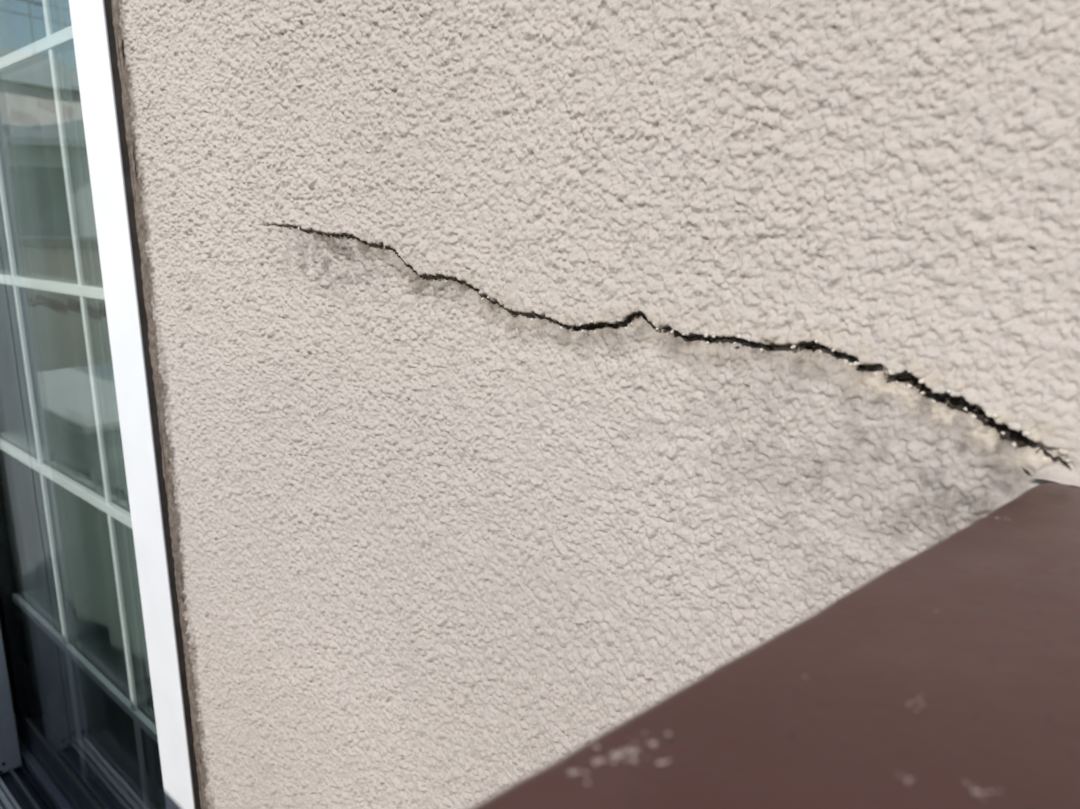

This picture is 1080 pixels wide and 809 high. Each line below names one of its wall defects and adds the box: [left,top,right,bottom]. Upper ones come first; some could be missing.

crack [263,224,1072,476]